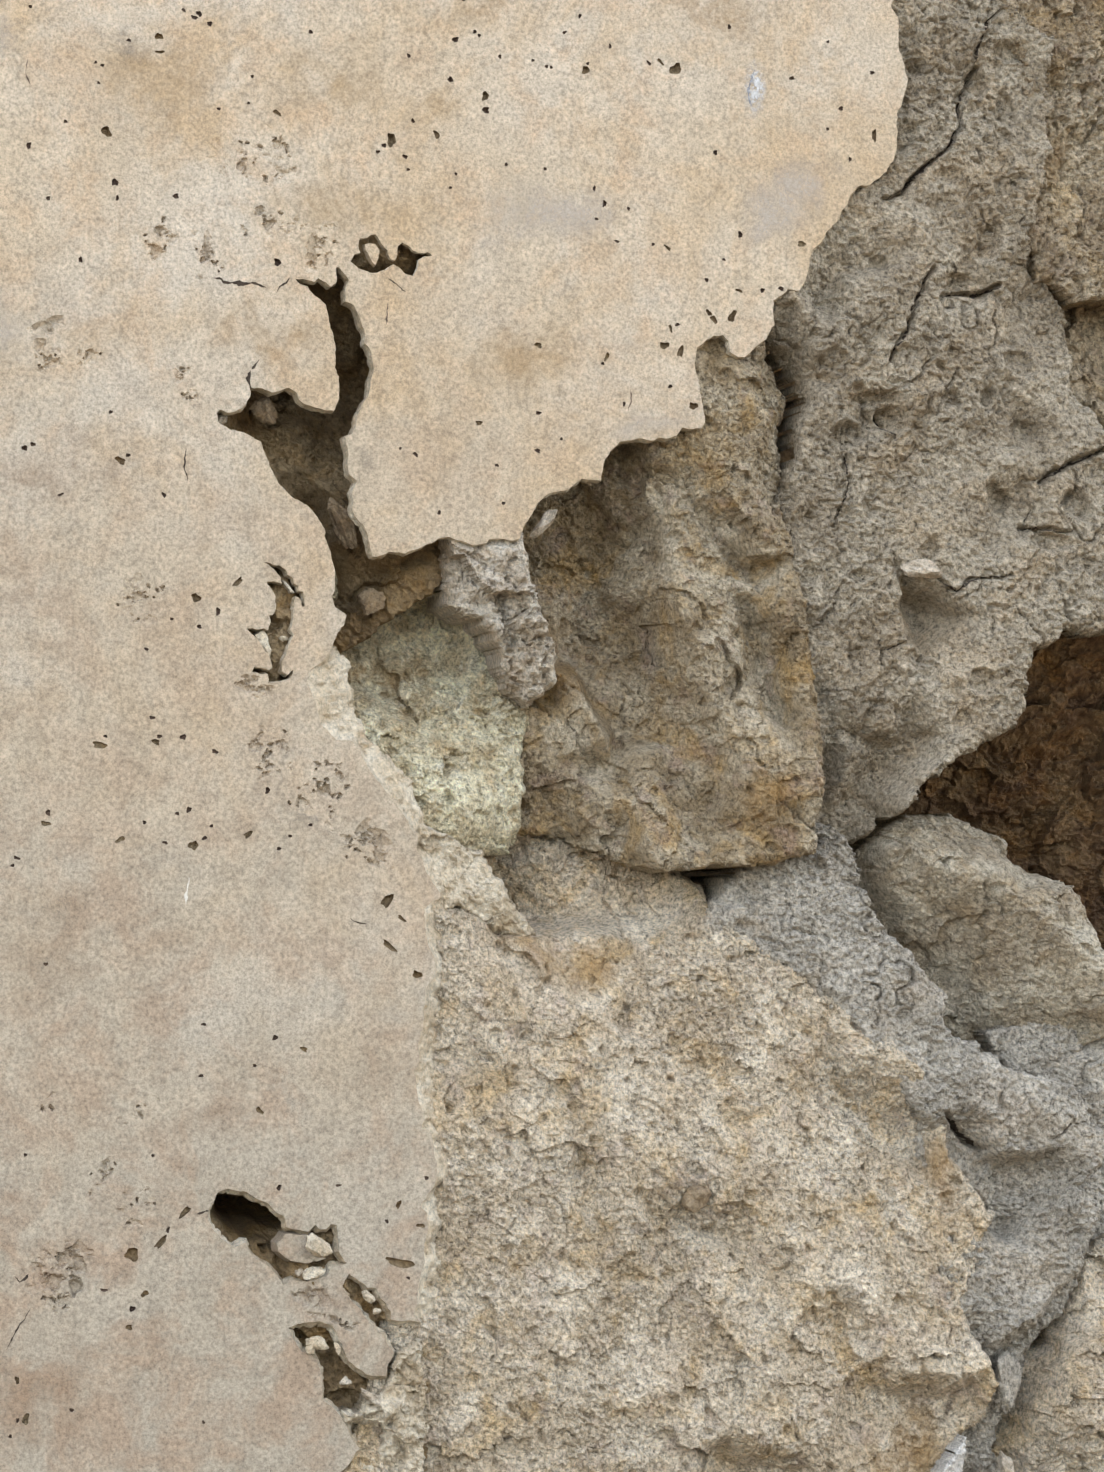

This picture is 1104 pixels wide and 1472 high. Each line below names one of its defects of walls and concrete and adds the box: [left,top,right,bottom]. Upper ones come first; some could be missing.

spalling [646,58,681,74]
crack [886,9,1000,200]
spalling [797,153,896,255]
spalling [735,285,803,302]
spalling [660,309,773,360]
crack [212,267,374,548]
spalling [610,427,701,452]
spalling [365,479,601,560]
crack [515,338,826,873]
spalling [84,562,449,1472]
spalling [930,1434,966,1472]